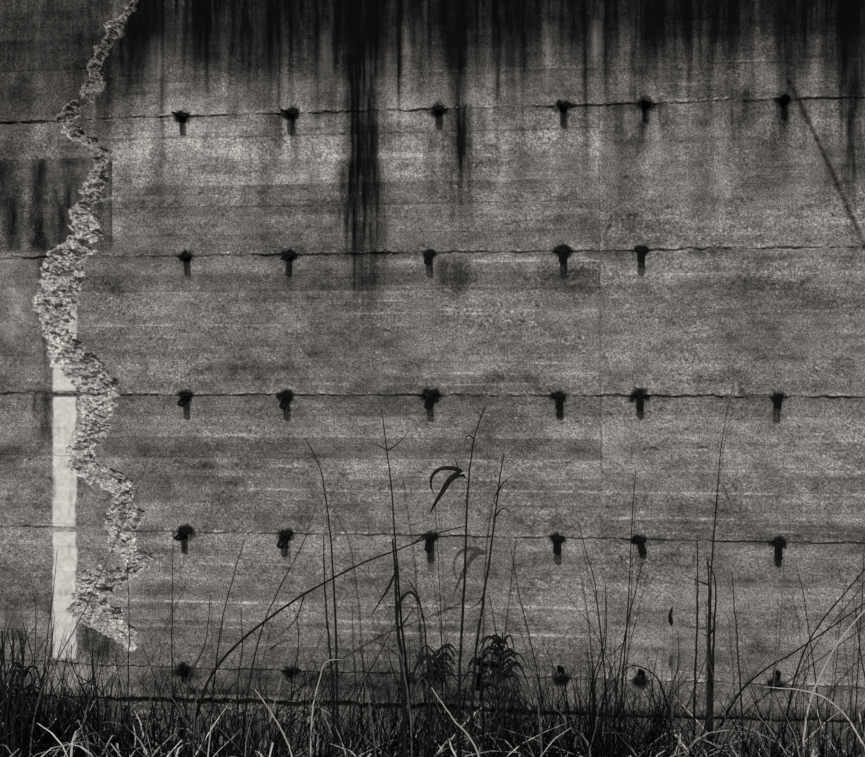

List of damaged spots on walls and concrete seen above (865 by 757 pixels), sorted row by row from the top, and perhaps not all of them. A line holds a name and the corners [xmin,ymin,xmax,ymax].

water stain [0,158,73,272]
water stain [85,0,753,283]
water stain [768,0,865,181]
spalling [66,557,139,652]